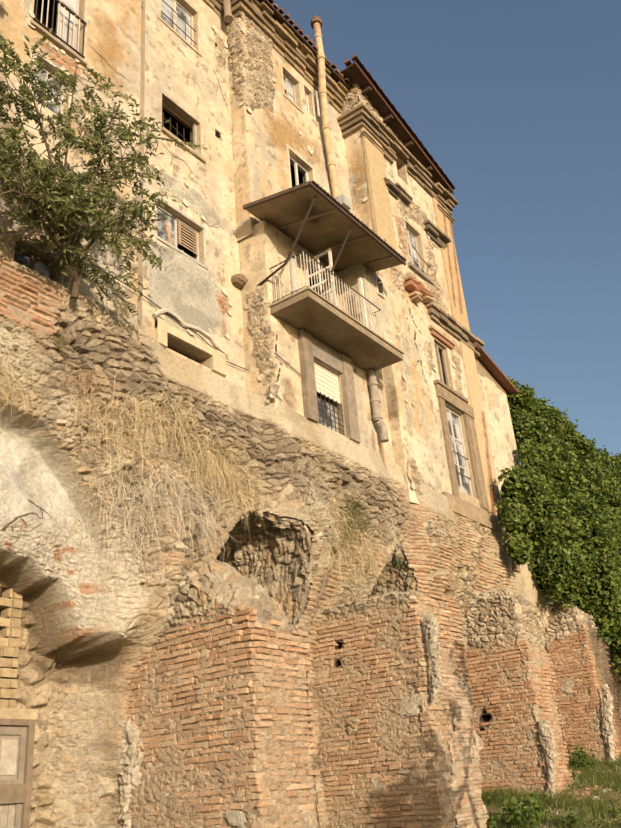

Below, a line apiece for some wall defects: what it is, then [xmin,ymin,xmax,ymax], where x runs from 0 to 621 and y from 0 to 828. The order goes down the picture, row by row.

flaking render [212,10,276,122]
flaking render [143,236,240,362]
flaking render [244,285,280,399]
flaking render [366,197,445,309]